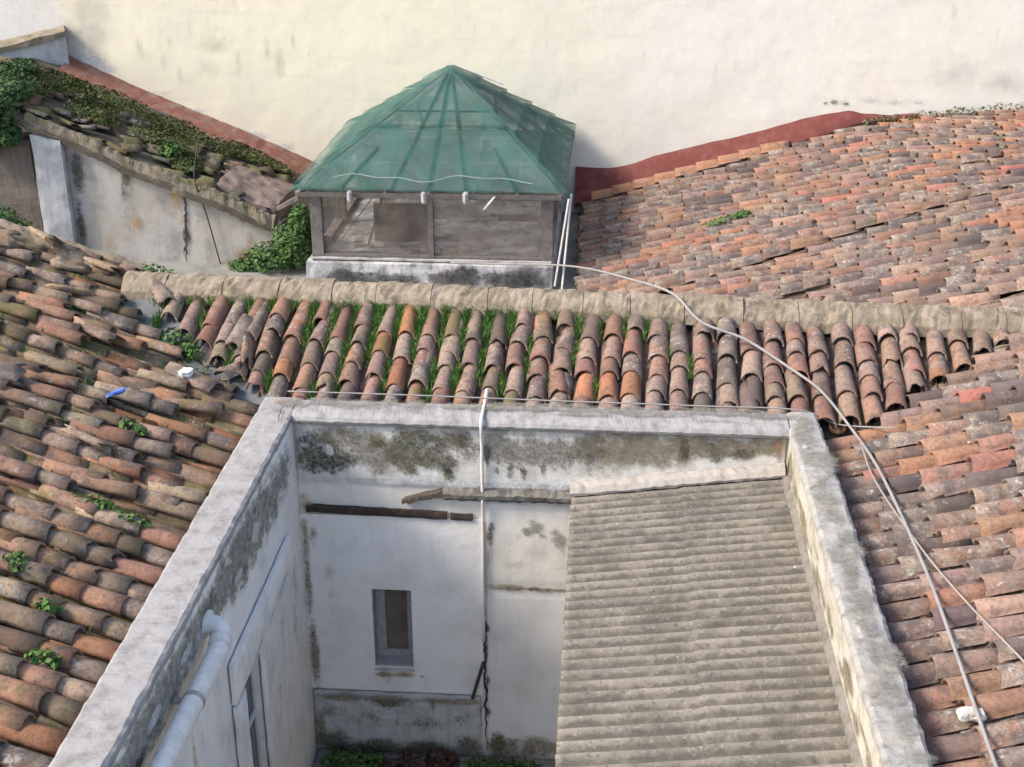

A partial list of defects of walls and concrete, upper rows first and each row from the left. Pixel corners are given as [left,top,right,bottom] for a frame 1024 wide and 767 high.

crack [182,198,190,262]
water stain [296,427,797,498]
water stain [522,521,565,552]
crack [481,591,489,745]
water stain [316,694,410,734]
water stain [424,699,491,716]